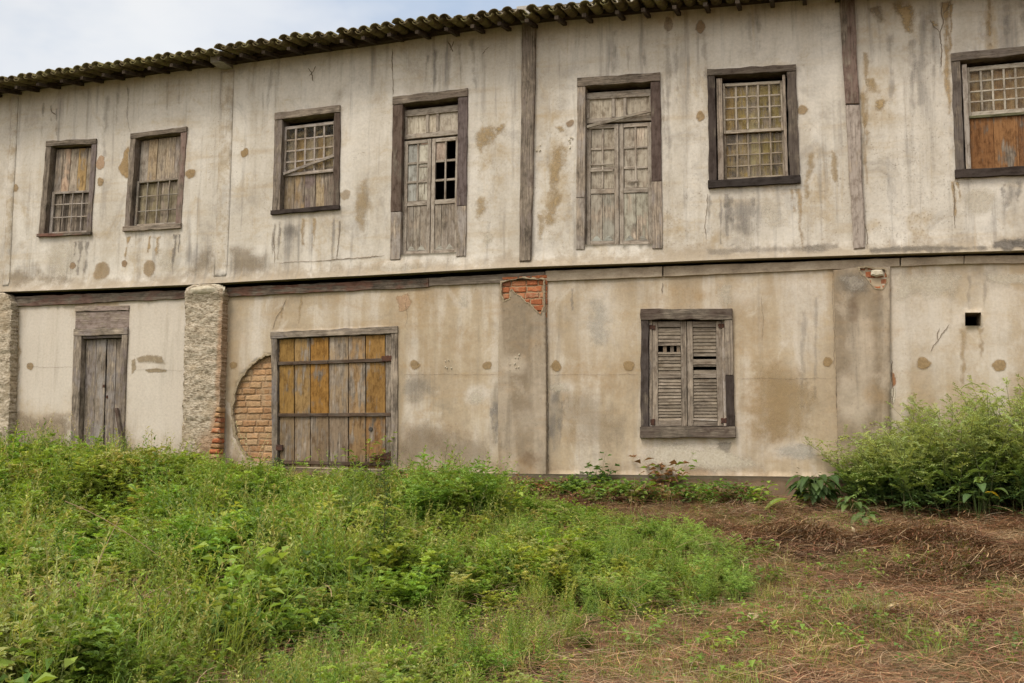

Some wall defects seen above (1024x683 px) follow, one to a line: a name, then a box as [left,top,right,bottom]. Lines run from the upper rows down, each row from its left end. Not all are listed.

crack [930,2,950,66]
peeling [477,124,504,150]
peeling [538,127,573,233]
flaking render [500,275,548,318]
flaking render [858,265,888,290]
peeling [132,355,166,373]
flaking render [209,352,280,464]